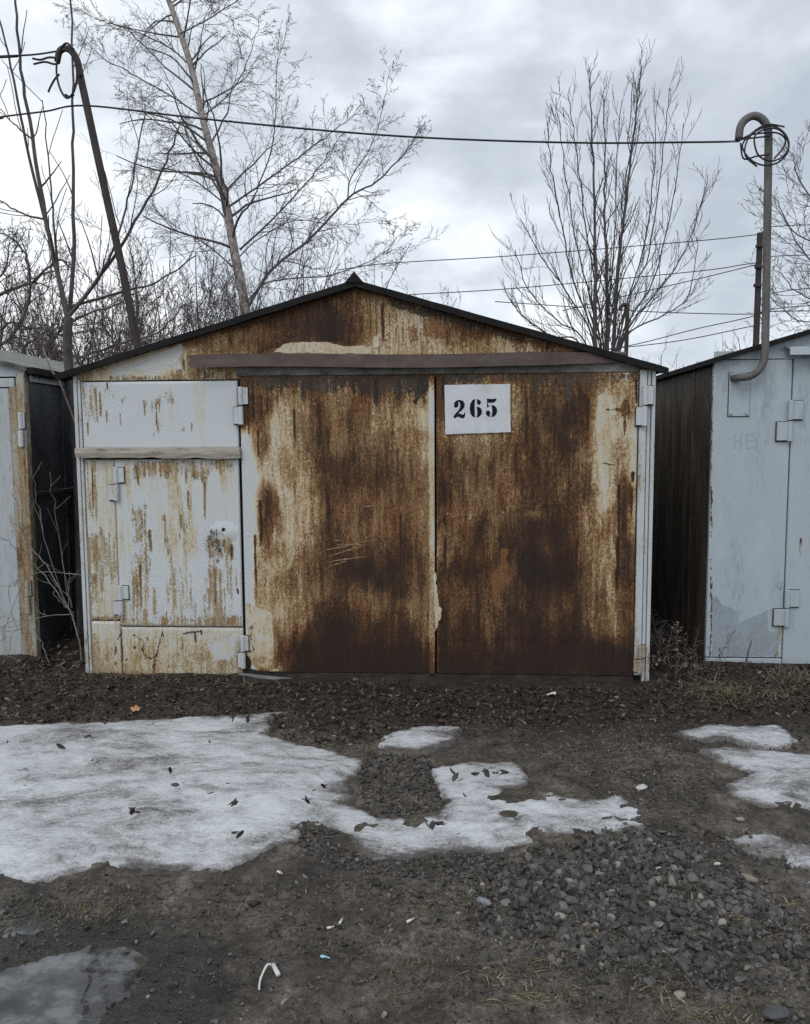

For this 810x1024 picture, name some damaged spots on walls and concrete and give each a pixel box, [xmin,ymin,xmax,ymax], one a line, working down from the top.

rust [205,290,500,354]
rust [82,355,635,675]
peeling [433,572,442,631]